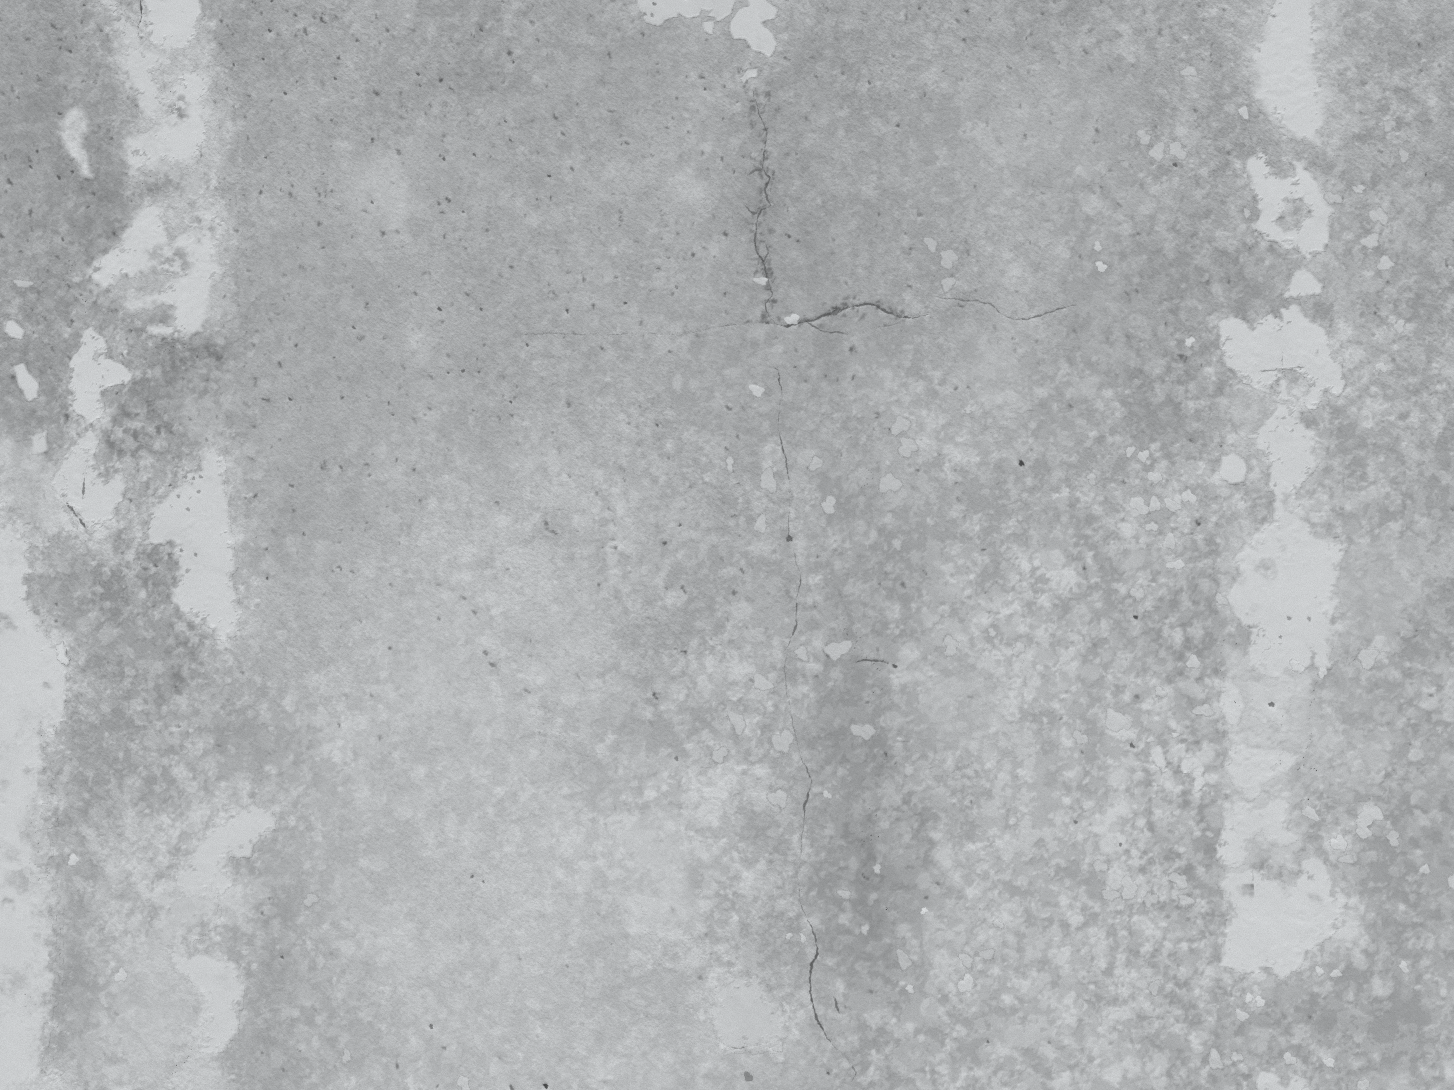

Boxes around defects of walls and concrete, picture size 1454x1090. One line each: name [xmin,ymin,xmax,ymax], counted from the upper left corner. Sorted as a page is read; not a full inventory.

peeling [636,0,779,83]
peeling [3,318,26,339]
peeling [11,361,39,401]
peeling [29,324,133,533]
peeling [83,0,229,342]
peeling [142,440,242,642]
crack [725,93,917,333]
crack [954,298,1063,320]
peeling [1130,0,1351,981]
peeling [0,491,70,1090]
crack [799,890,839,1040]
peeling [1255,1069,1314,1090]